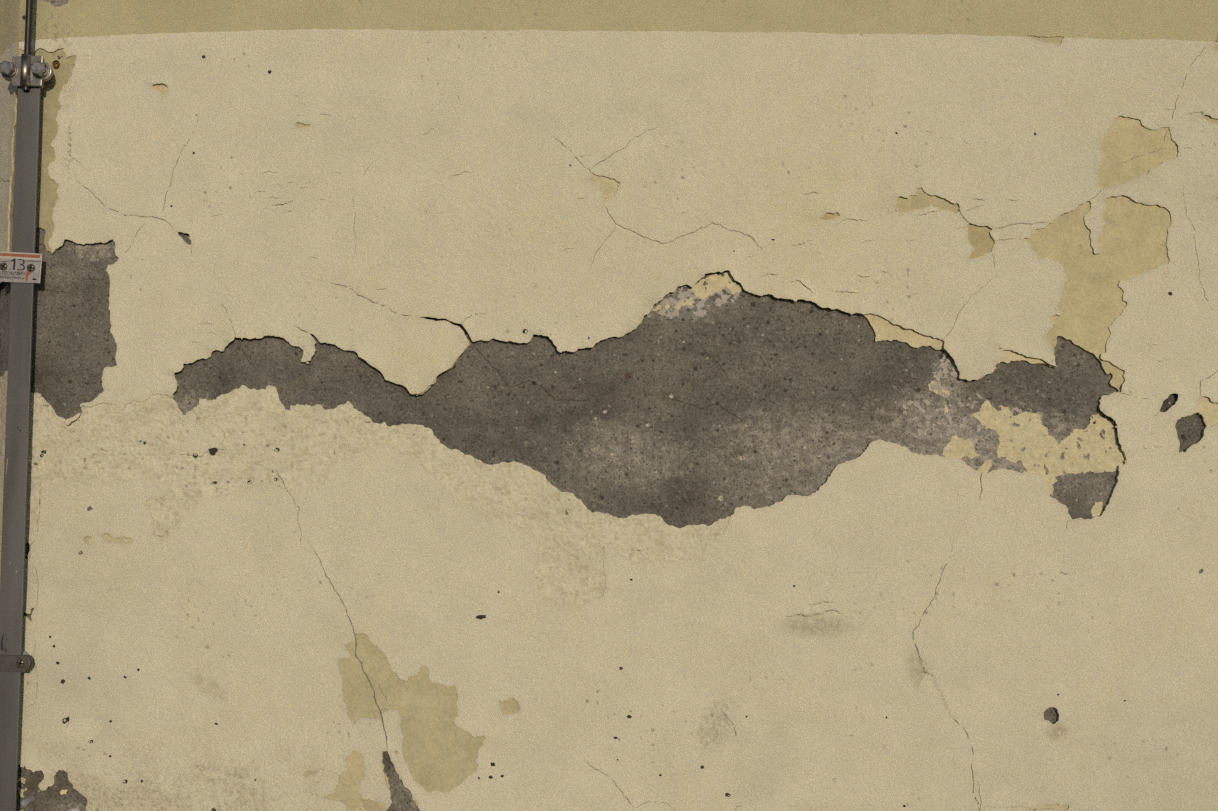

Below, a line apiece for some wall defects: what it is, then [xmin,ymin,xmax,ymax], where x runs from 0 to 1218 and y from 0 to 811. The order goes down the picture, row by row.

spalling [0,282,11,461]
crack [76,115,198,248]
crack [330,196,587,401]
spalling [21,49,1193,604]
crack [591,206,756,265]
spalling [1160,393,1218,452]
crack [276,470,387,744]
spalling [17,765,88,811]
peeling [324,633,504,811]
peeling [499,698,521,715]